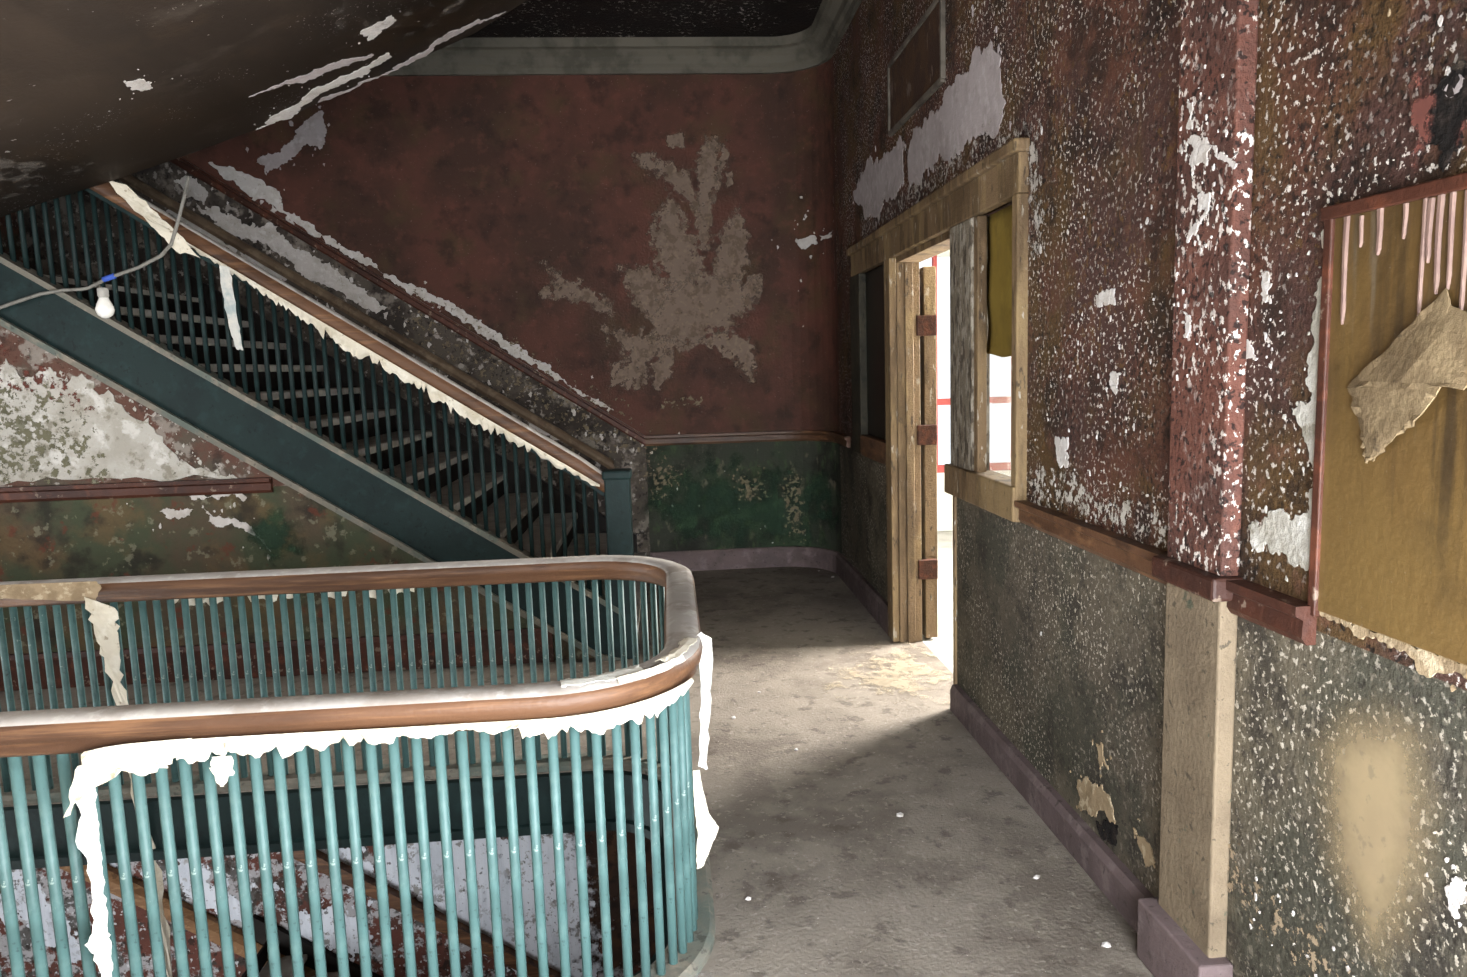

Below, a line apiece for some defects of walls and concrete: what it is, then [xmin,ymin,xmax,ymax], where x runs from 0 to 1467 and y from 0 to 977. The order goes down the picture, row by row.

peeling [346,11,401,44]
peeling [833,26,1045,256]
peeling [110,53,704,500]
water stain [1359,208,1384,255]
water stain [1401,190,1467,316]
peeling [0,333,237,485]
peeling [1028,371,1169,547]
peeling [1246,229,1324,582]
peeling [0,581,129,706]
peeling [1319,611,1467,692]
peeling [0,632,719,977]
peeling [1444,857,1467,927]